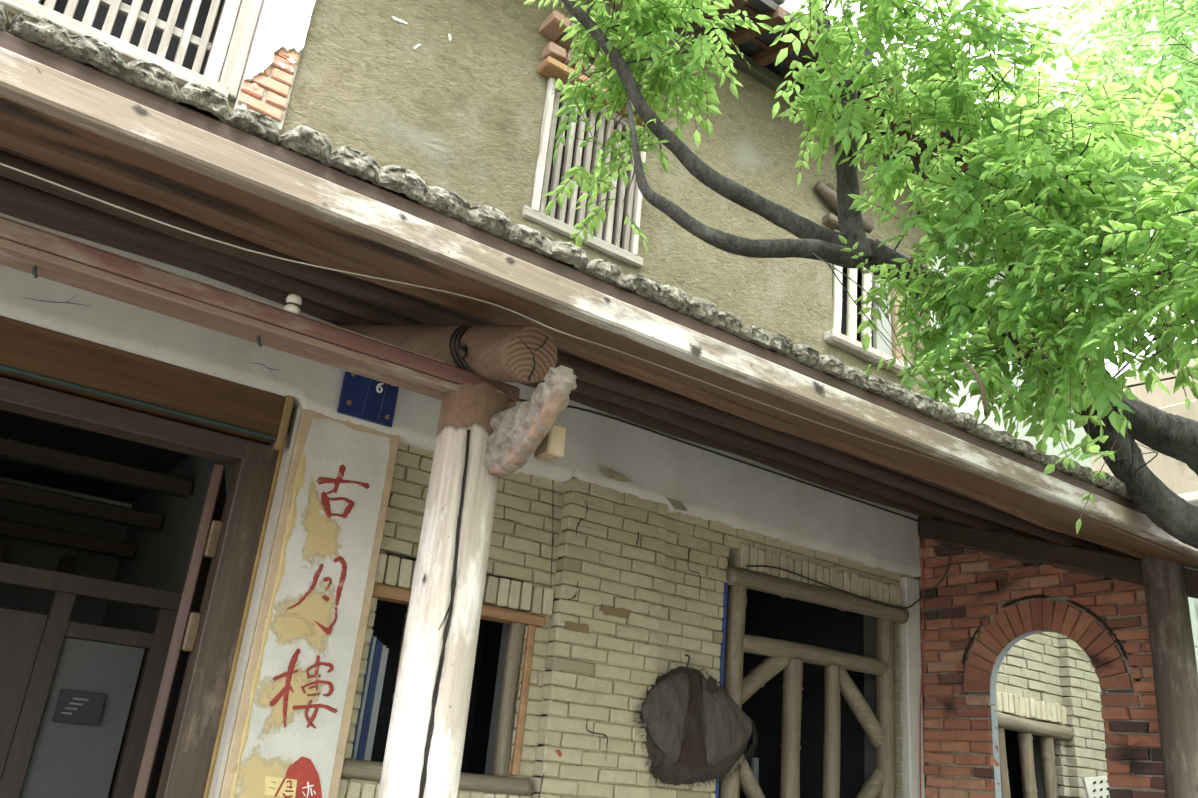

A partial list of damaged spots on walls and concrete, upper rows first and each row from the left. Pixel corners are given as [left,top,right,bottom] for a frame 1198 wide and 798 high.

flaking render [233,0,316,133]
crack [419,429,470,798]